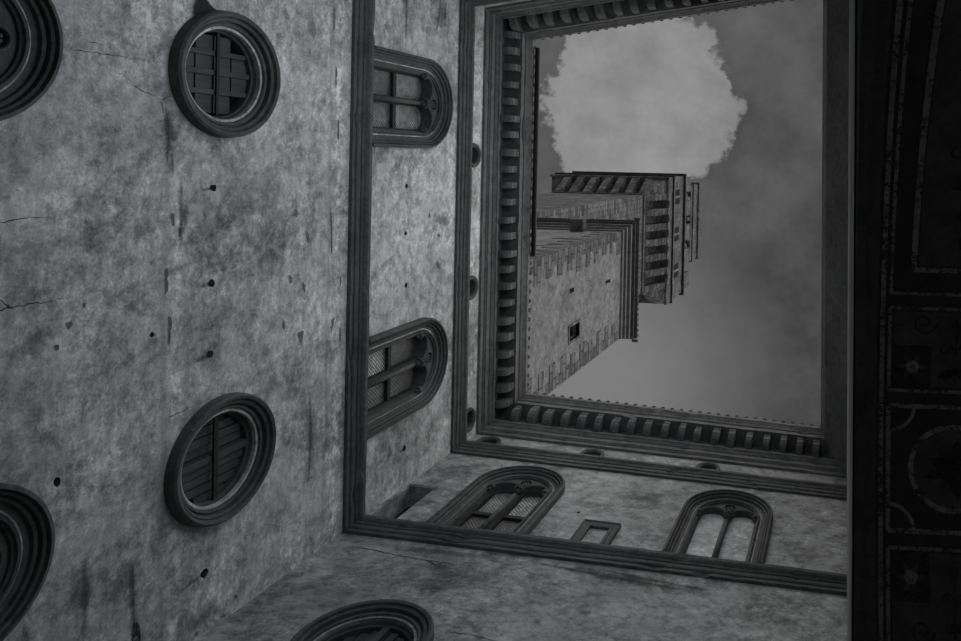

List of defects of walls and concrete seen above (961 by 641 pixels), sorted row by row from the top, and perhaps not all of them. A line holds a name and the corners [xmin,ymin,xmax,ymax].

crack [0,296,72,311]